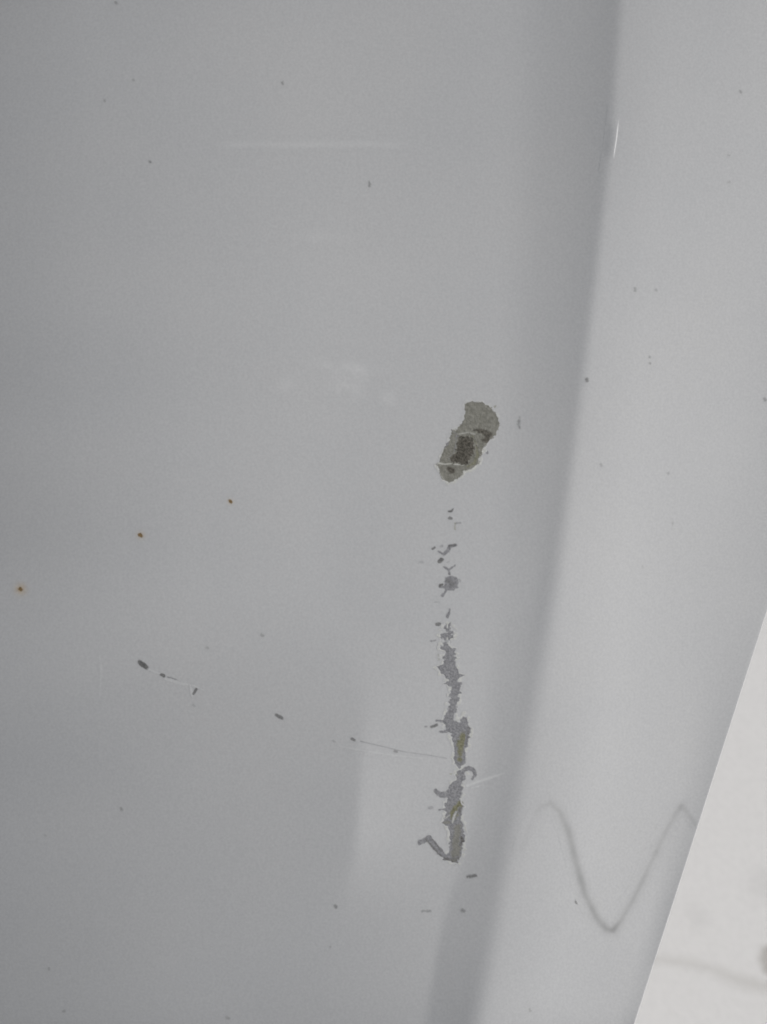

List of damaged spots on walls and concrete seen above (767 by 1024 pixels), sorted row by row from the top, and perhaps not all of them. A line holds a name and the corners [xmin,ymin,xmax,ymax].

peeling [434,399,502,486]
peeling [430,508,462,564]
peeling [423,618,478,880]